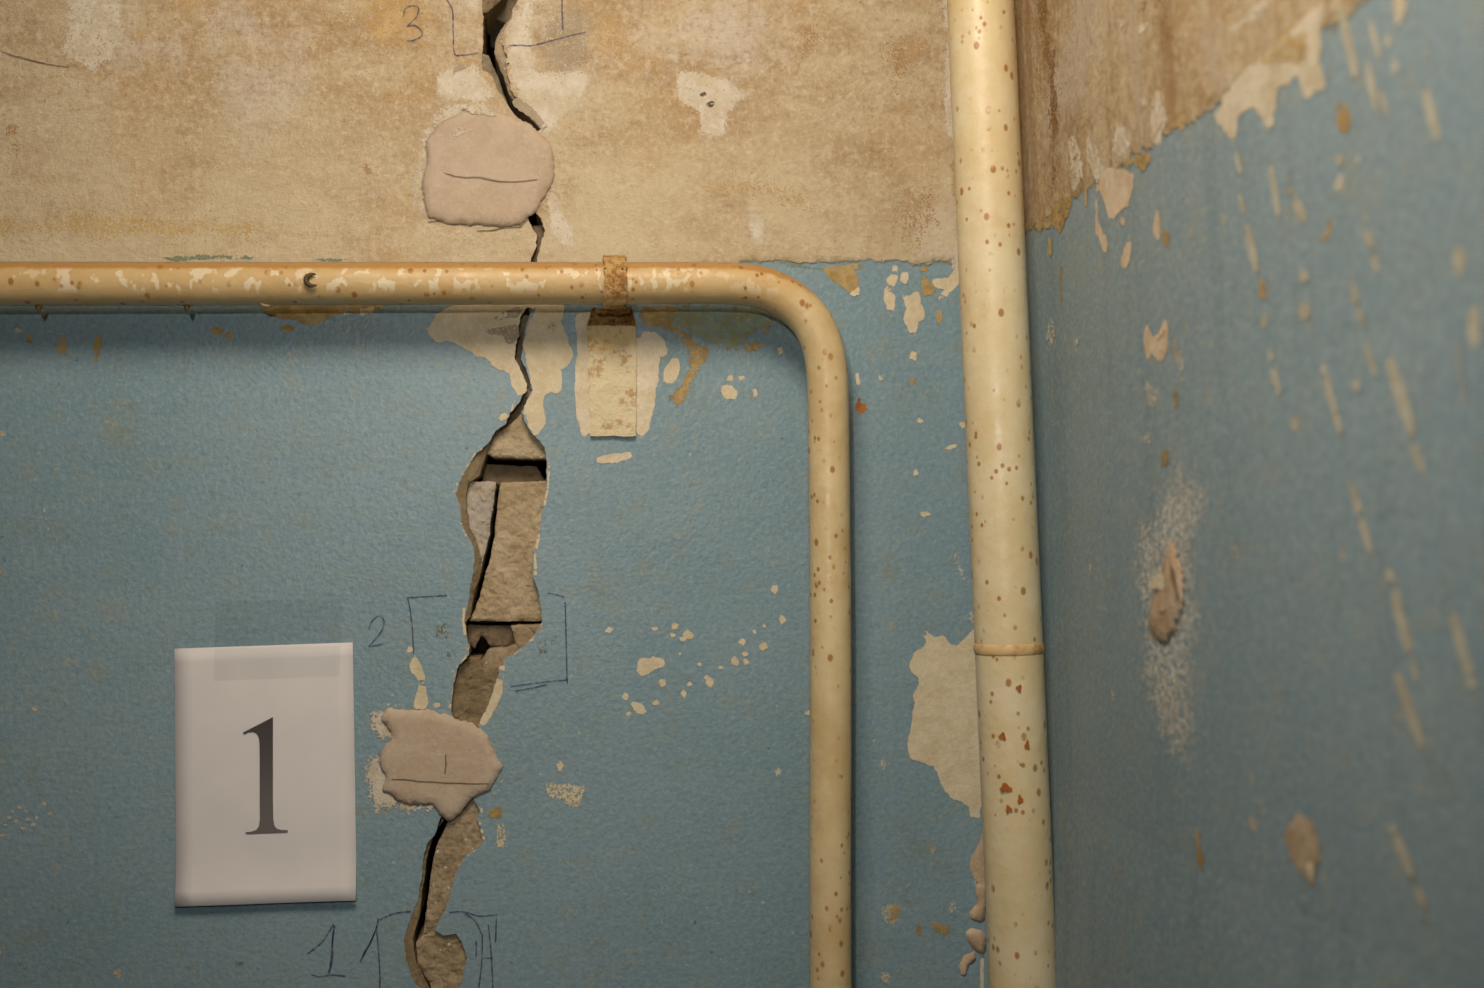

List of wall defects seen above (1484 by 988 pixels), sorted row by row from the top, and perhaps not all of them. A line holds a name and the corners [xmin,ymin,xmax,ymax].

crack [482,0,542,131]
peeling [1205,0,1406,174]
crack [443,172,537,182]
crack [481,218,528,231]
peeling [787,263,864,296]
peeling [1033,92,1186,347]
peeling [597,331,680,464]
peeling [721,375,757,400]
flaking render [407,305,591,728]
peeling [622,615,786,716]
peeling [907,611,986,988]
crack [392,755,490,988]